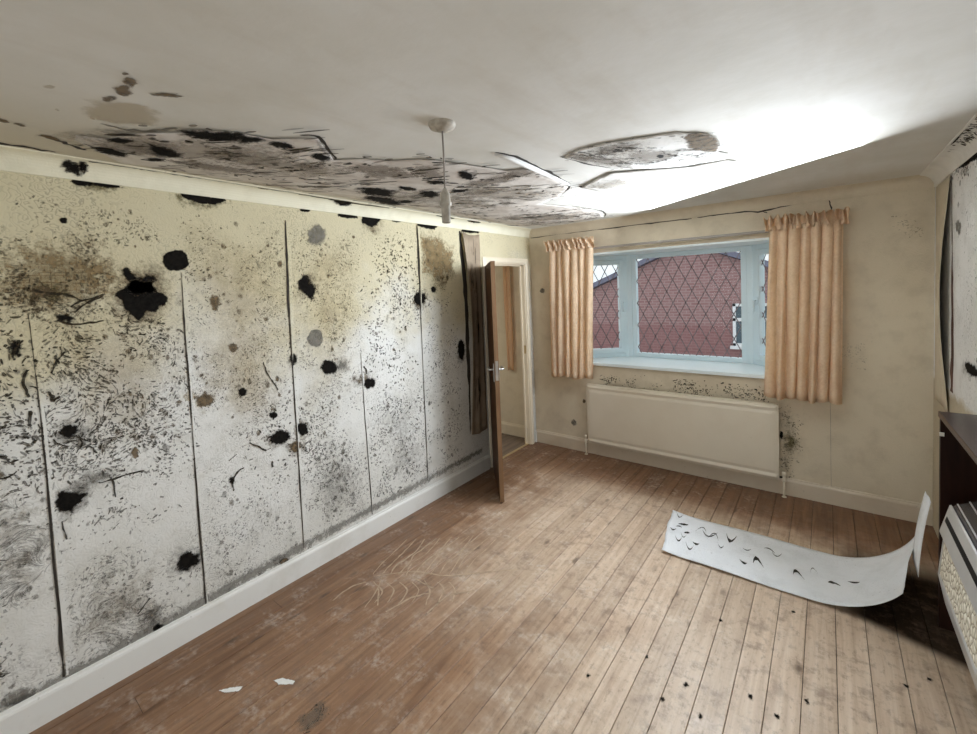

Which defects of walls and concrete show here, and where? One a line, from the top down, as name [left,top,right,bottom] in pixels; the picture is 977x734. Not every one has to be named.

mould [62,160,123,190]
damp [950,153,977,185]
mould [461,220,481,344]
damp [0,194,465,553]
damp [673,379,769,403]
mould [177,552,201,596]
mould [137,598,176,632]
damp [0,659,34,706]